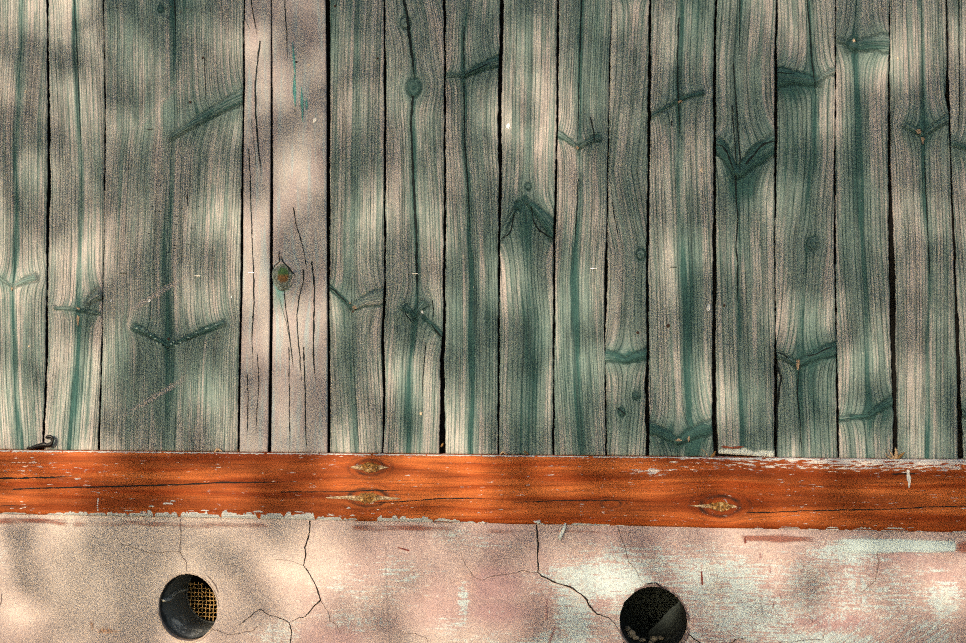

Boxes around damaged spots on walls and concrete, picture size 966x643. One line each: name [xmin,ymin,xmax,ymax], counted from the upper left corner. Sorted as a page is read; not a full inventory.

peeling [0,500,358,521]
crack [0,476,486,506]
peeling [371,509,486,523]
crack [514,497,627,505]
peeling [558,523,624,540]
crack [115,519,218,592]
crack [617,526,663,588]
crack [212,521,340,643]
crack [460,525,624,643]